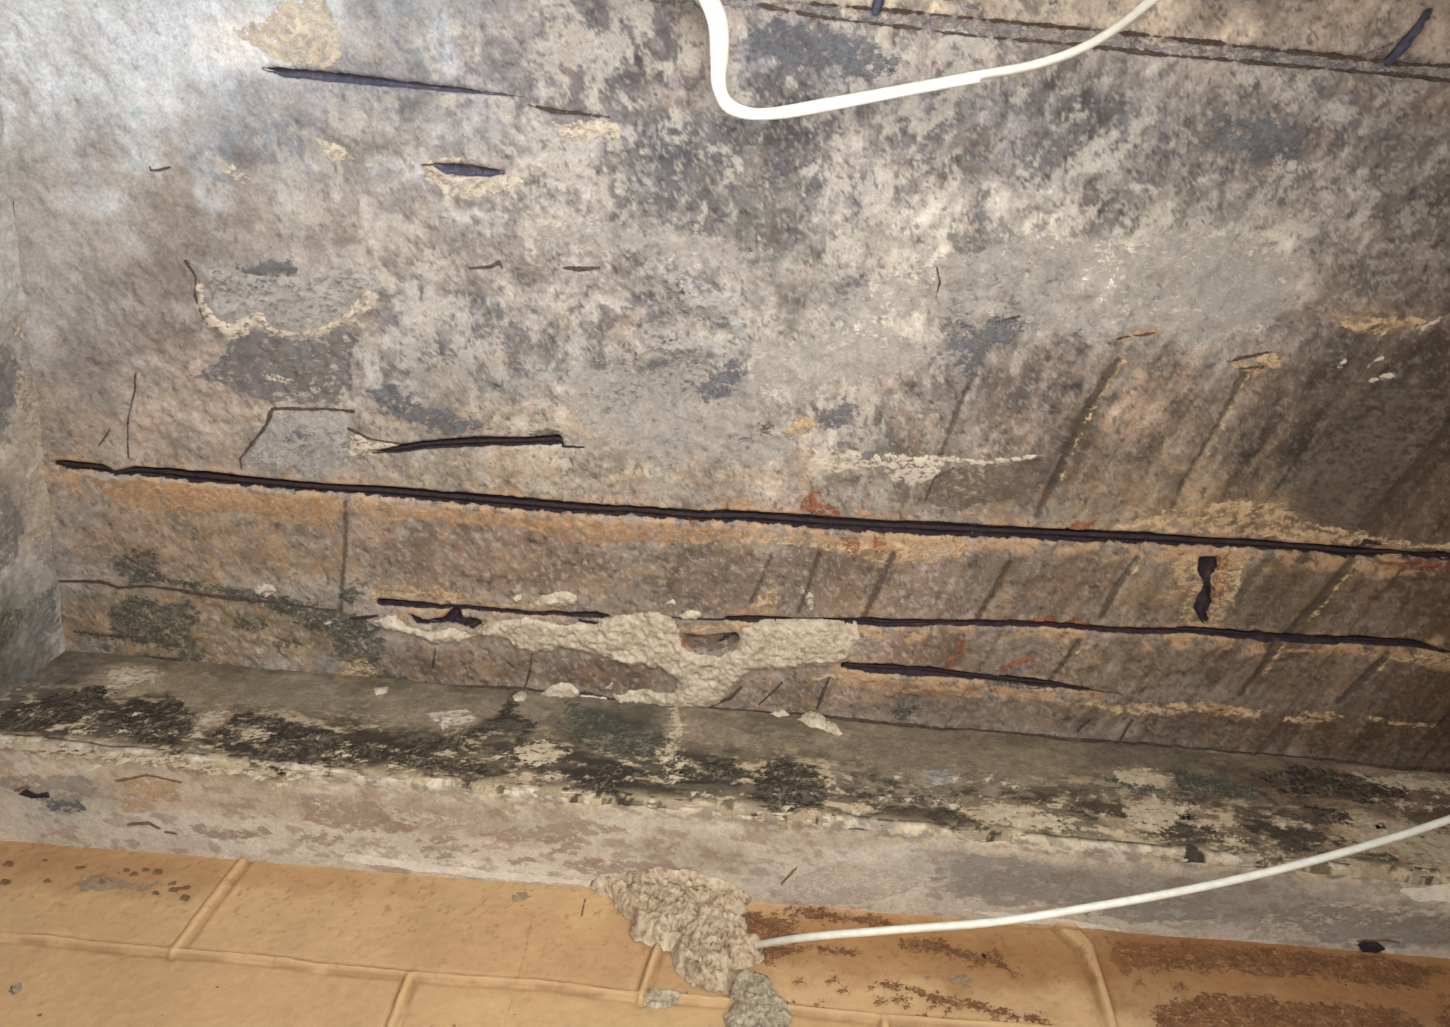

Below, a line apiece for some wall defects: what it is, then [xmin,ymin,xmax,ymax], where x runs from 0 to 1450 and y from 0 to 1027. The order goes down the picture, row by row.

crack [262,67,610,118]
crack [55,373,1450,560]
corrosion [92,479,965,567]
hole [1193,556,1223,623]
corrosion [1116,499,1450,628]
spalling [410,607,482,629]
hole [678,621,740,653]
crack [672,615,1450,653]
corrosion [1073,685,1264,718]
mould [0,685,540,775]
damp [0,775,99,814]
mould [702,758,828,813]